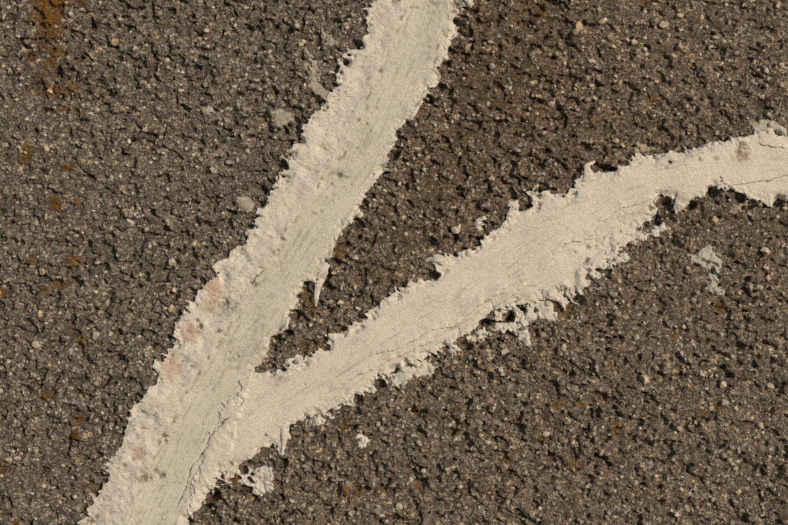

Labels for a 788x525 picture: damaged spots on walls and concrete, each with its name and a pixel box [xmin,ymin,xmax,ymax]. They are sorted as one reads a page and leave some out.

corrosion [29,0,66,60]
crack [77,0,474,525]
crack [187,120,788,513]